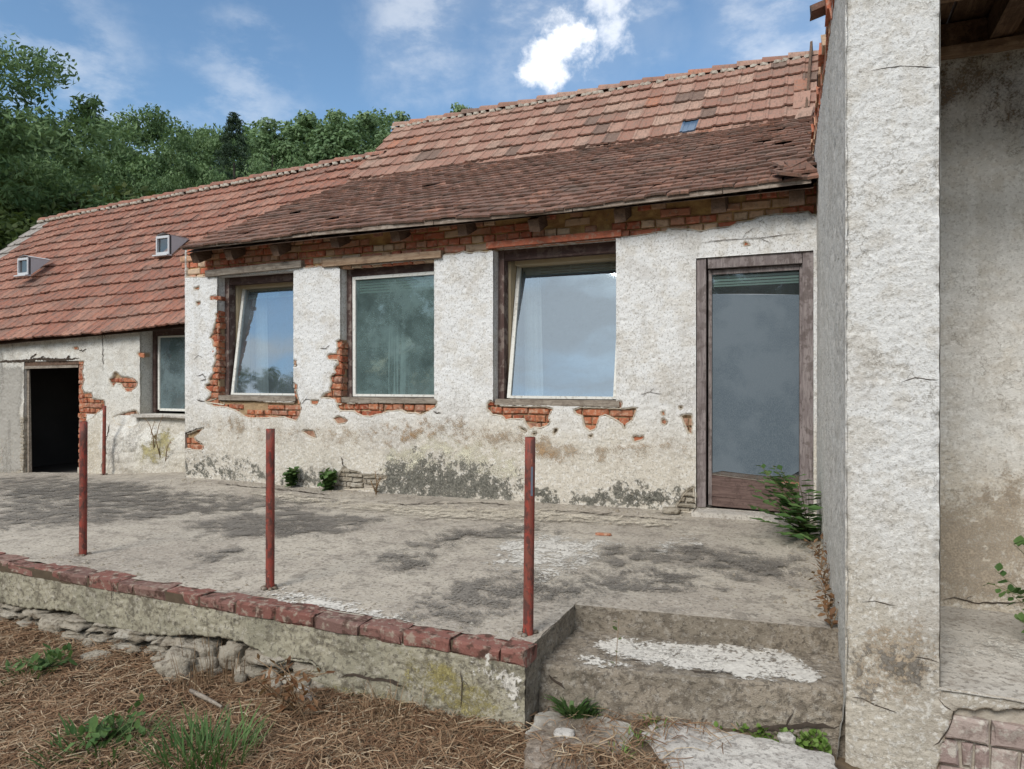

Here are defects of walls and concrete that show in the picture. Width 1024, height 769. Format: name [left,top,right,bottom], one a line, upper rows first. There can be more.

spalling [73,346,139,468]
spalling [180,182,817,442]
damp [0,416,811,625]
crack [942,596,1019,604]